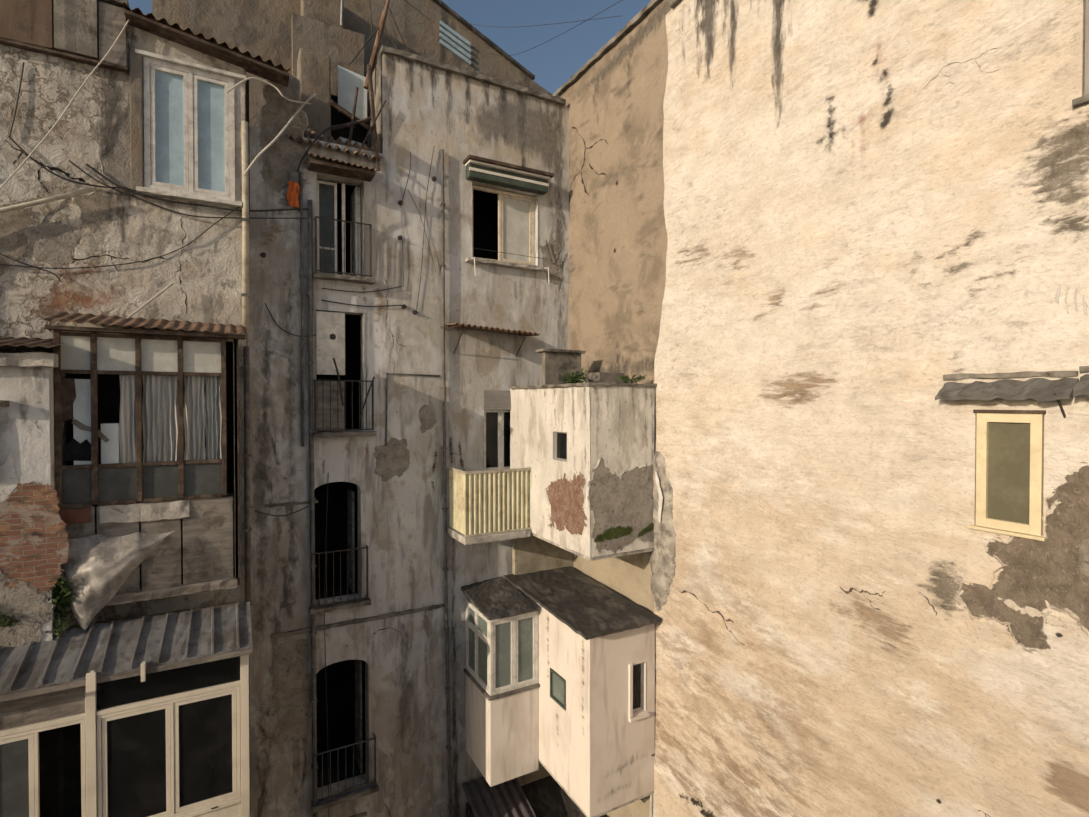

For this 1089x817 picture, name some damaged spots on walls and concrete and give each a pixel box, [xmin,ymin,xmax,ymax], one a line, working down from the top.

damp [695,0,738,74]
damp [772,0,784,112]
damp [872,60,893,127]
crack [569,127,608,202]
flaking render [417,405,436,434]
flaking render [373,438,411,482]
flaking render [0,452,70,604]
flaking render [545,458,654,554]
flaking render [957,462,1089,654]
crack [680,793,716,817]